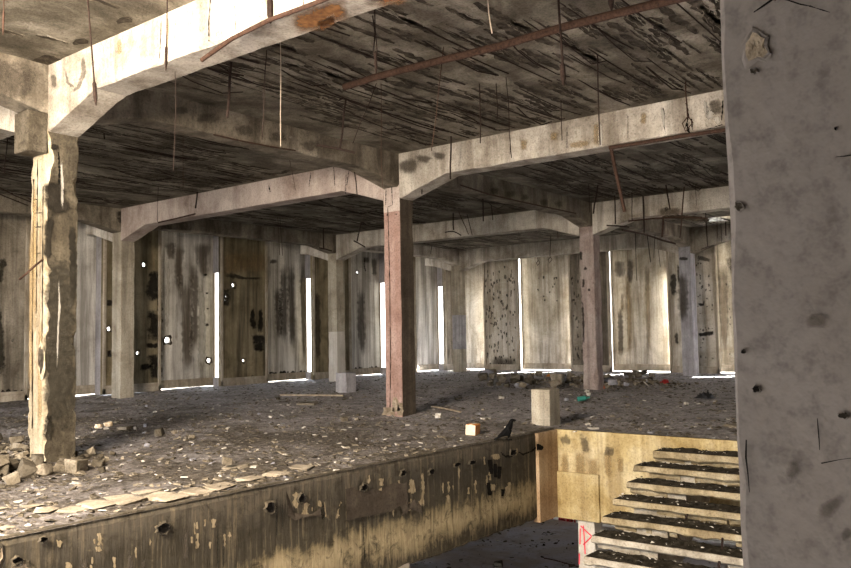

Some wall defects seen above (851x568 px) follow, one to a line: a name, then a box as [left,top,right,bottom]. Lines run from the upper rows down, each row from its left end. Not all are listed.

corrosion [295,4,345,30]
peeling [182,57,274,94]
peeling [308,27,398,68]
peeling [281,59,514,145]
peeling [415,22,630,106]
peeling [493,88,581,125]
peeling [591,24,691,94]
spalling [741,27,772,74]
peeling [116,127,268,190]
leakage [275,270,305,354]
flaking render [398,468,435,511]
spalling [442,448,518,503]